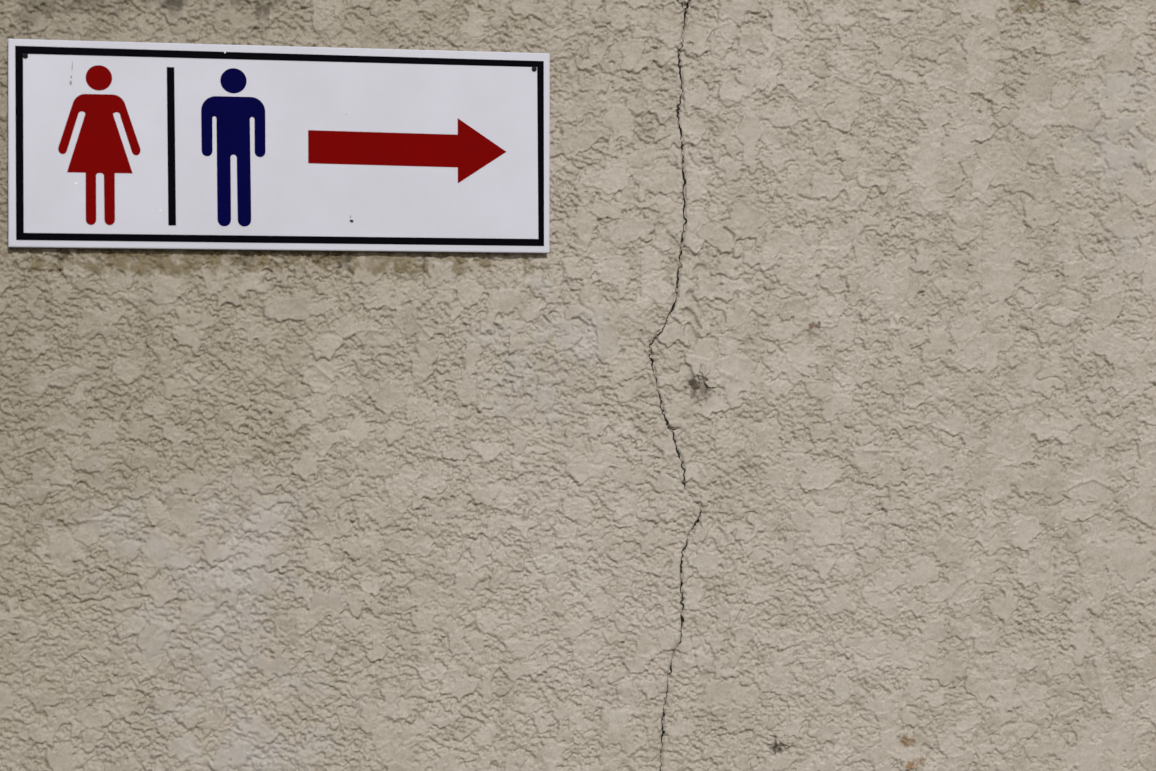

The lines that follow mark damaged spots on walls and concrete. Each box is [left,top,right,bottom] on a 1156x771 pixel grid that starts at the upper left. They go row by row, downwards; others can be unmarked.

crack [649,0,702,771]